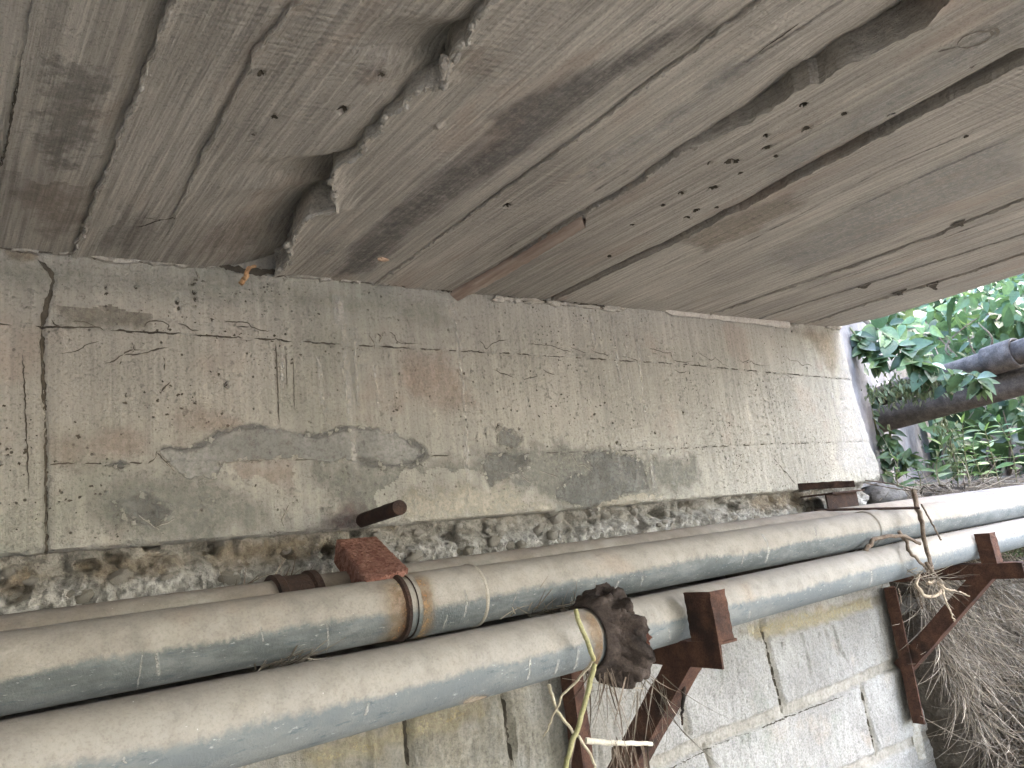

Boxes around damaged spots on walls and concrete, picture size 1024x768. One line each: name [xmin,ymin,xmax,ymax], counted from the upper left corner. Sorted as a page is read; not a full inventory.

peeling [402,7,489,112]
damp [340,37,676,274]
crack [52,320,198,392]
crack [226,321,295,417]
crack [480,339,809,380]
peeling [160,424,429,483]